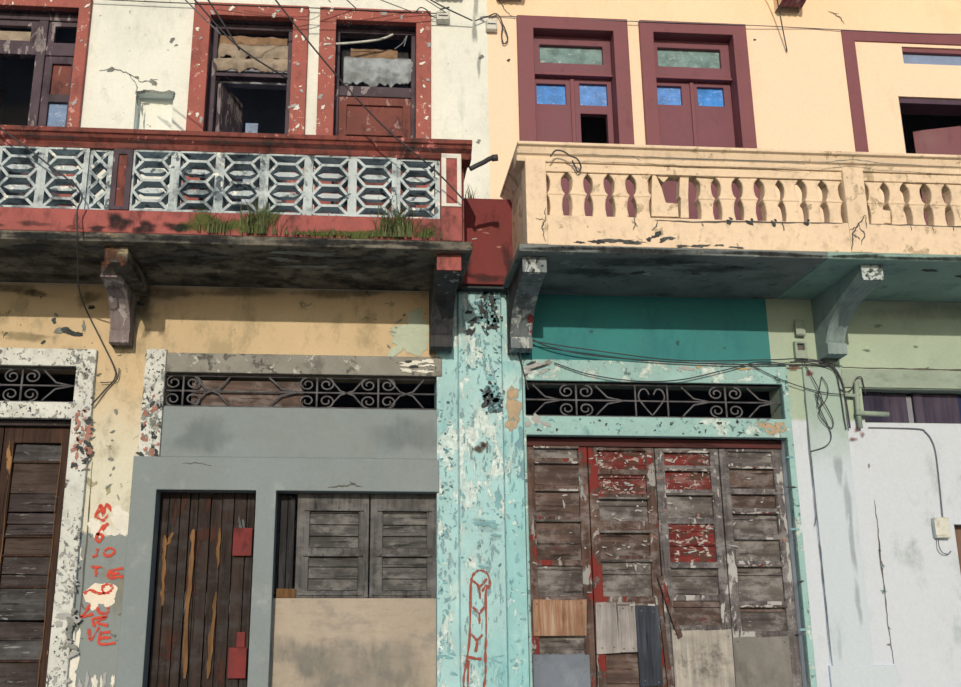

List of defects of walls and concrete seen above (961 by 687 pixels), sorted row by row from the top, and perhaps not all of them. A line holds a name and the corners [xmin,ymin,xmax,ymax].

leakage [1,214,237,256]
crack [633,215,961,247]
peeling [387,308,435,373]
peeling [524,359,553,377]
peeling [136,351,164,456]
peeling [438,292,521,552]
peeling [525,413,558,433]
peeling [682,420,784,436]
peeling [47,457,129,687]
crack [874,500,894,664]
peeling [436,553,501,687]